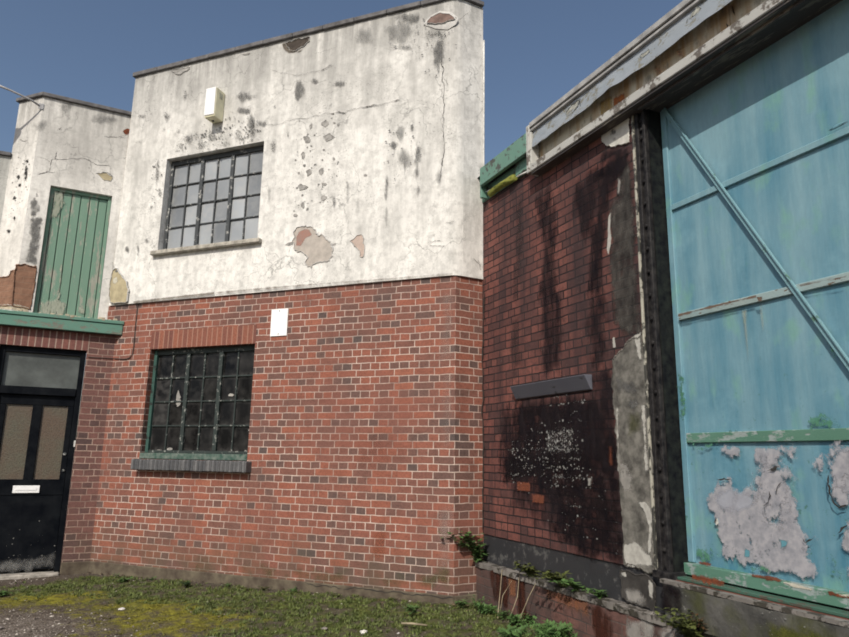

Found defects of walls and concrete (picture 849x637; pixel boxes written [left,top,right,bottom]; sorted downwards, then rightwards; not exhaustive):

spalling [283,36,310,53]
spalling [601,118,630,147]
peeling [286,113,339,269]
damp [574,150,628,249]
spalling [0,255,66,315]
spalling [109,268,129,304]
damp [537,195,560,371]
damp [591,265,605,365]
spalling [607,164,656,612]
damp [512,420,592,531]
peeling [706,445,818,579]
peeling [813,440,849,505]